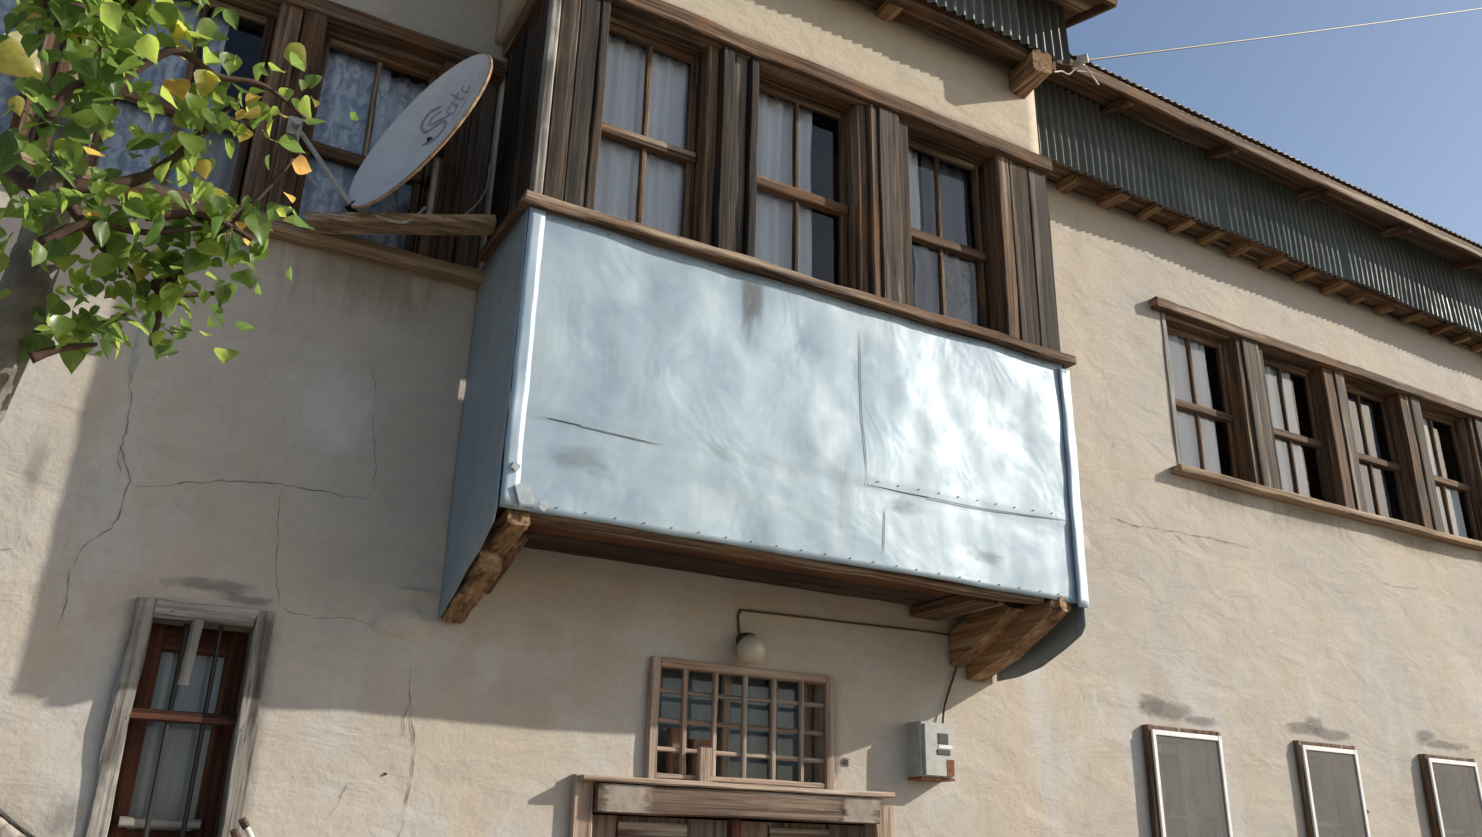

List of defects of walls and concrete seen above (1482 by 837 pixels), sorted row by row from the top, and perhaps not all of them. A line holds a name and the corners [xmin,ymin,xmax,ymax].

crack [62,324,377,625]
crack [1090,503,1244,547]
crack [399,682,415,835]